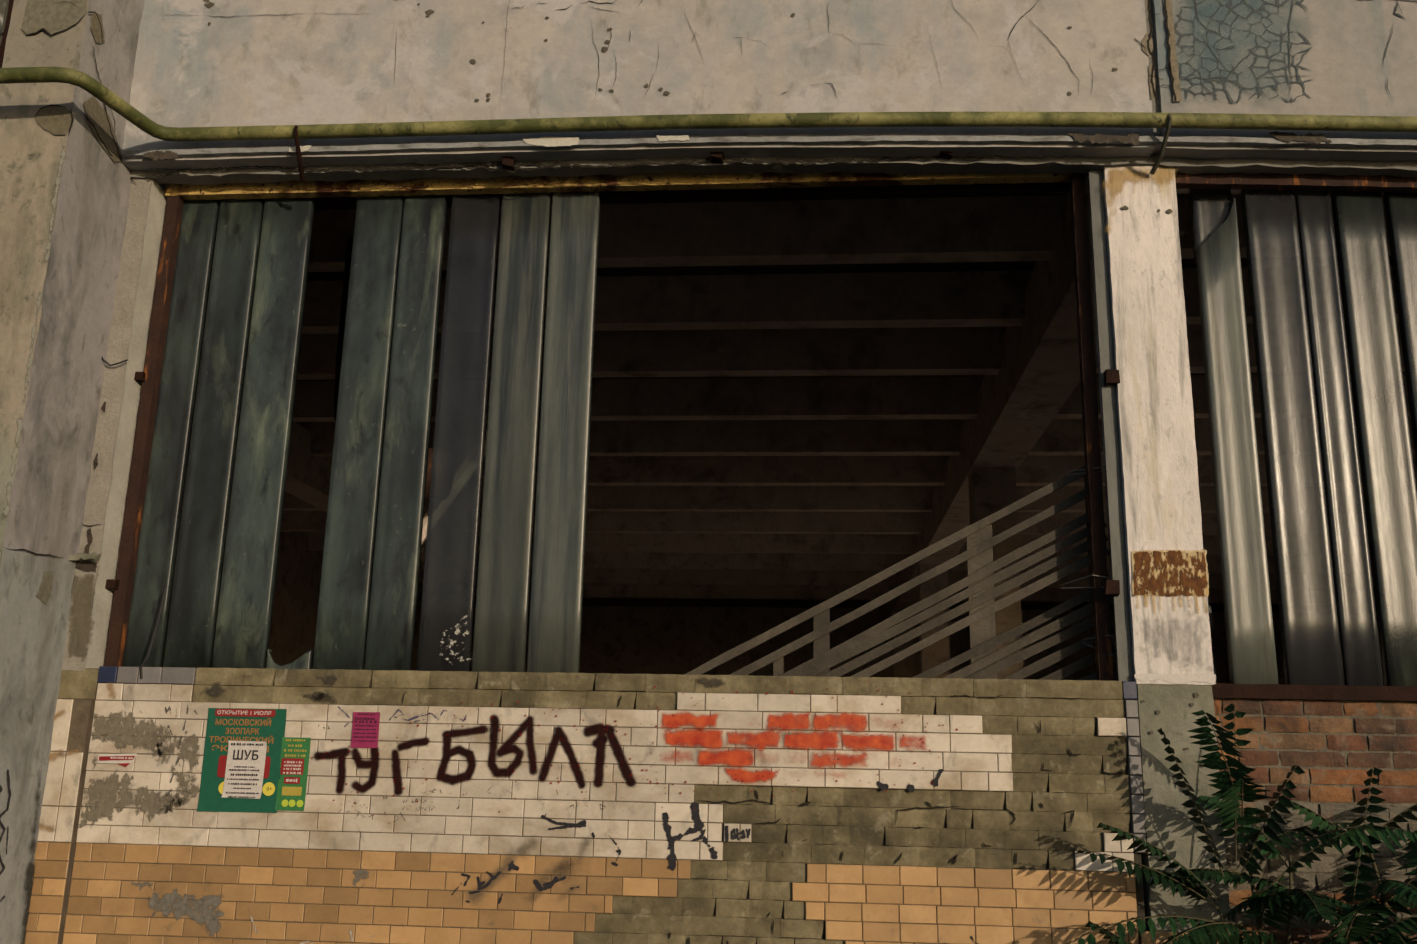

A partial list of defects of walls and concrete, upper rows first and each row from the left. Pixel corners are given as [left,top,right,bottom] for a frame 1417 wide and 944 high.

crack [951,0,1093,91]
crack [1174,0,1312,103]
crack [1383,0,1417,96]
rust [1132,550,1209,613]
peeling [58,668,200,828]
peeling [193,615,1216,944]
peeling [132,882,224,936]